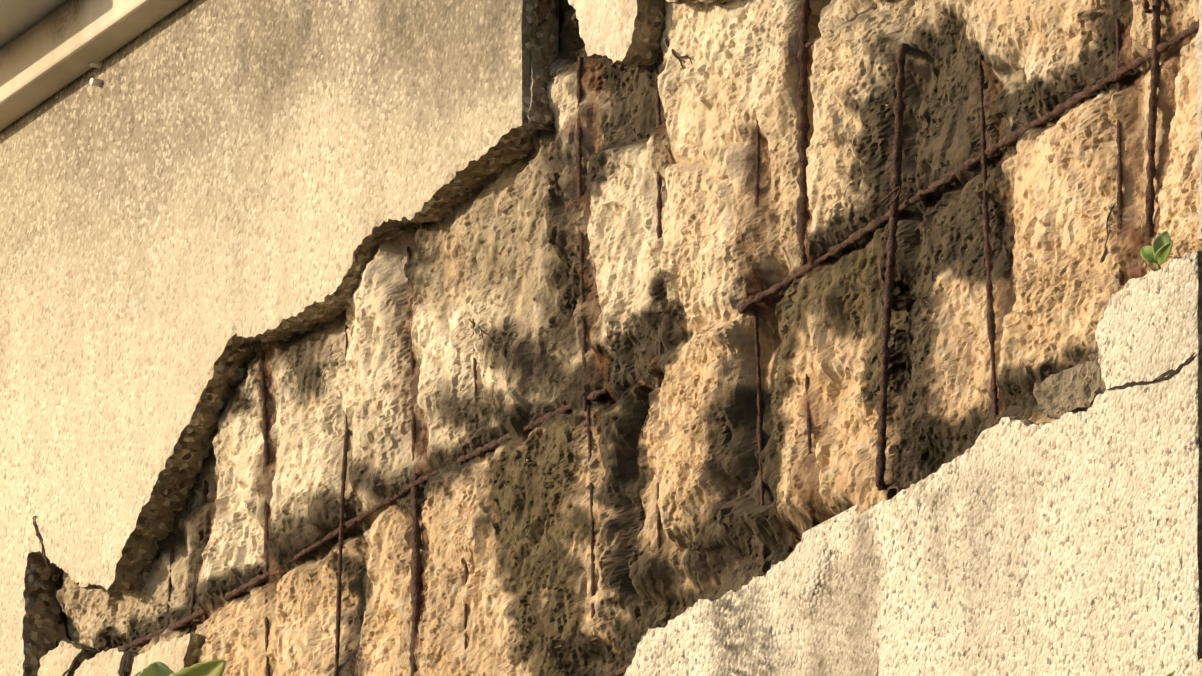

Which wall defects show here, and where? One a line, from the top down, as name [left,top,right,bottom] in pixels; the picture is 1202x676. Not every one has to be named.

corrosion [1161,0,1182,93]
corrosion [565,59,605,148]
spalling [804,0,1108,262]
corrosion [735,211,773,316]
spalling [923,0,1202,427]
corrosion [1121,211,1160,278]
corrosion [259,444,277,497]
corrosion [394,288,420,387]
spalling [37,0,801,676]
corrosion [415,415,428,476]
spalling [775,277,916,533]
crack [1107,352,1196,390]